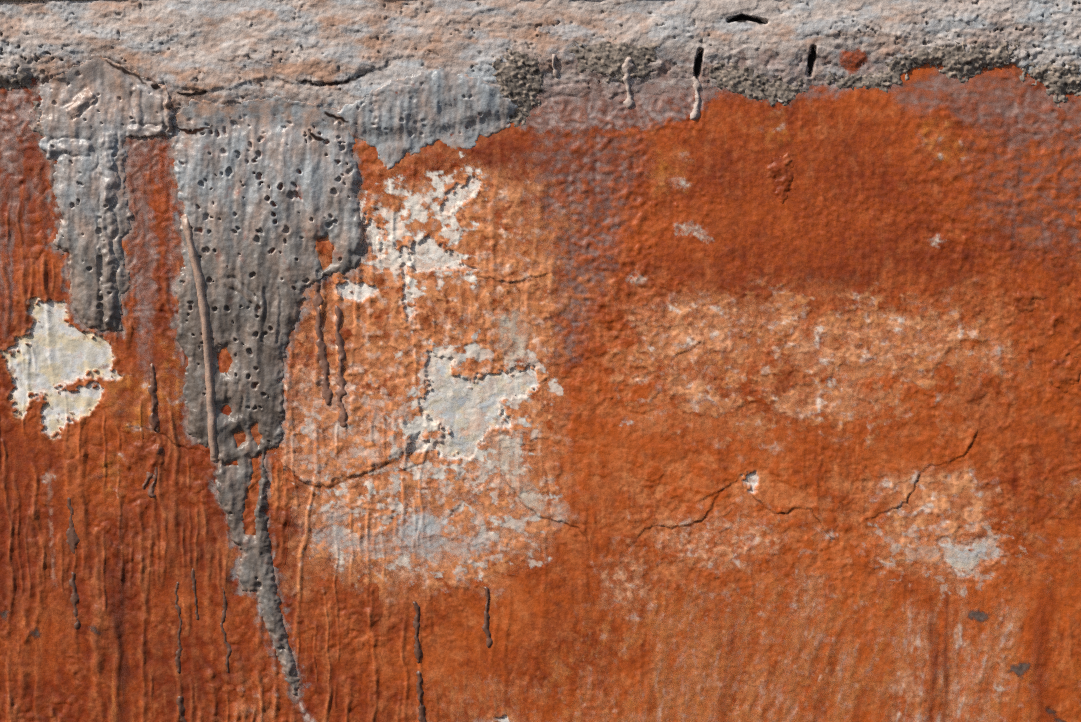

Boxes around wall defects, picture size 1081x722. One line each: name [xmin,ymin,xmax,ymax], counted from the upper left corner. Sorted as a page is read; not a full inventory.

peeling [0,297,130,439]
peeling [125,382,182,432]
peeling [274,152,571,603]
peeling [461,705,515,722]